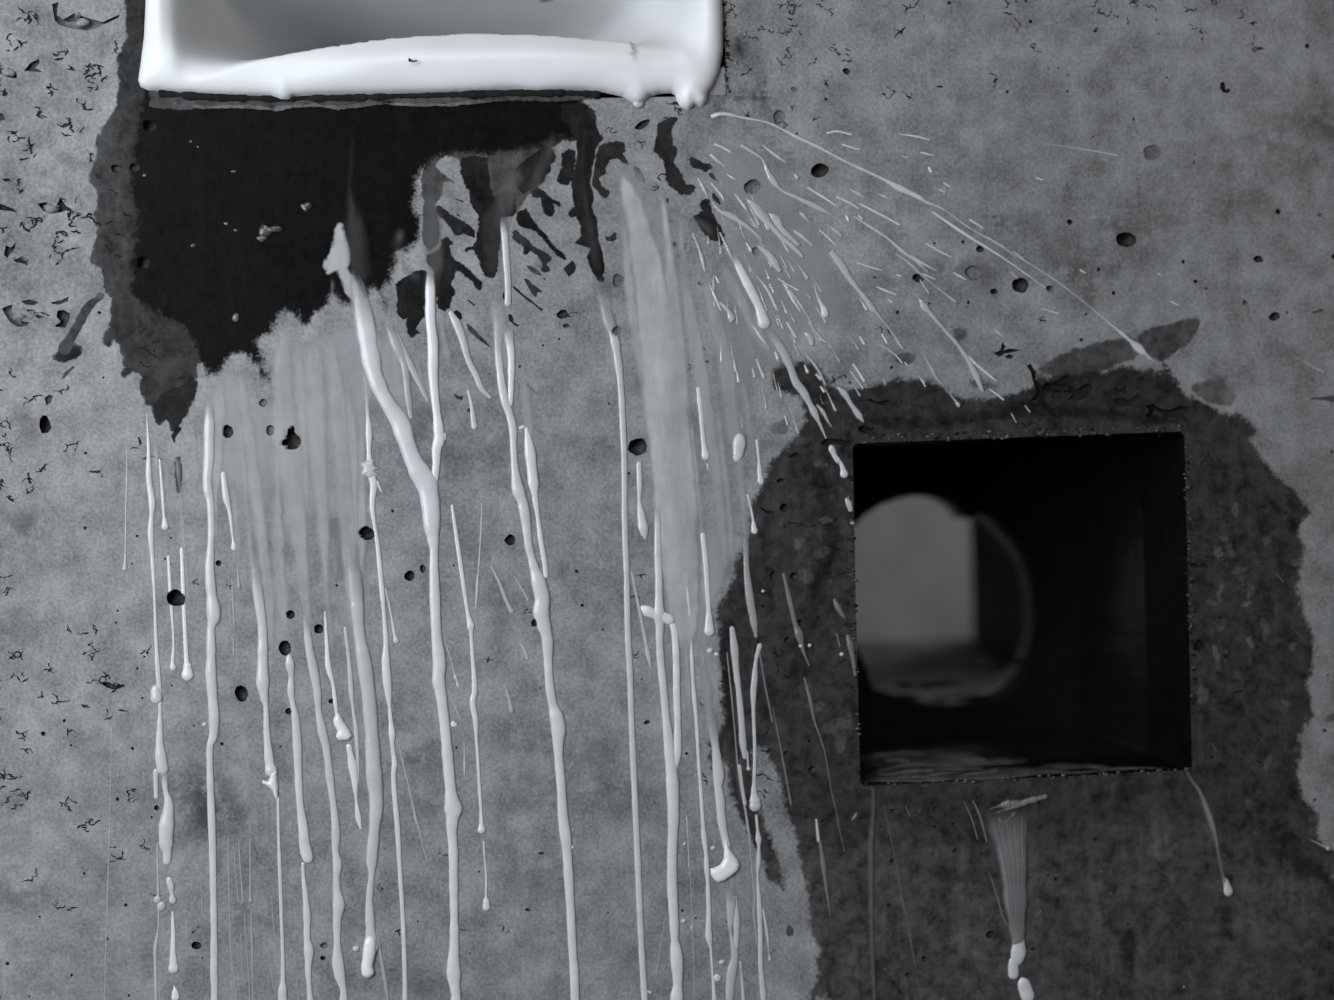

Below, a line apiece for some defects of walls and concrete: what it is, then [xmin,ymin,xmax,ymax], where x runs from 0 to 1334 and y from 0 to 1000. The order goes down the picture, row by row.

leakage [52,0,645,637]
leakage [653,117,1334,1000]